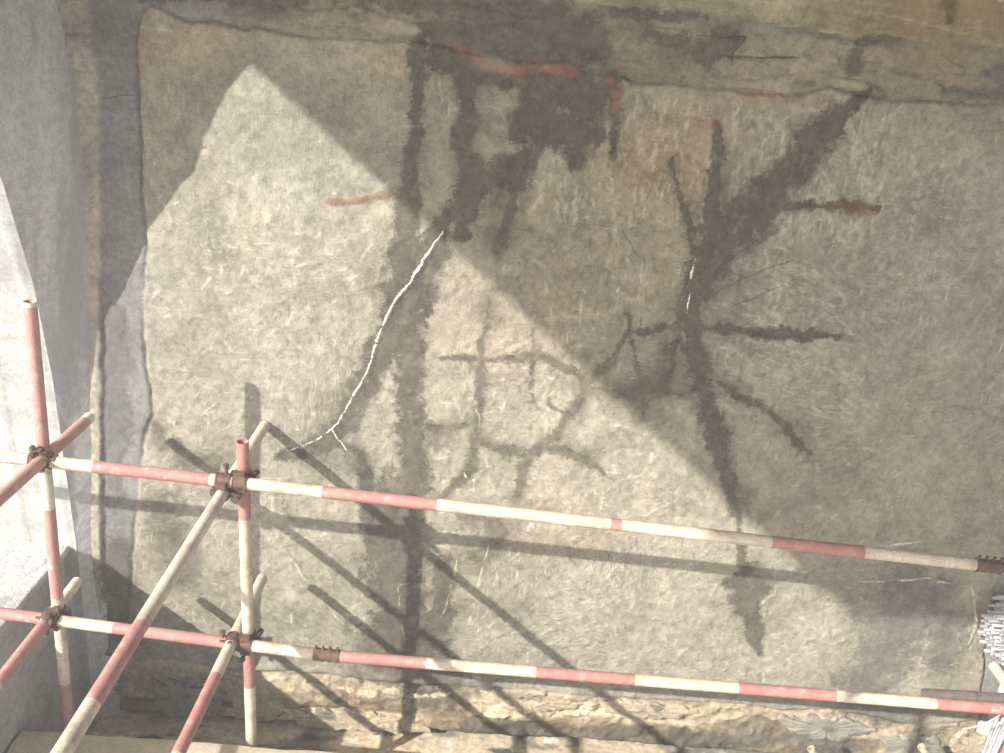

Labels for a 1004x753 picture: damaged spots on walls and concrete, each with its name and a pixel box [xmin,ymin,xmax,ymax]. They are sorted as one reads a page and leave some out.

water stain [844,35,901,76]
water stain [276,0,881,532]
water stain [97,304,132,463]
water stain [147,419,225,471]
water stain [95,535,144,624]
water stain [141,492,187,576]
water stain [339,503,508,712]
water stain [721,544,773,656]